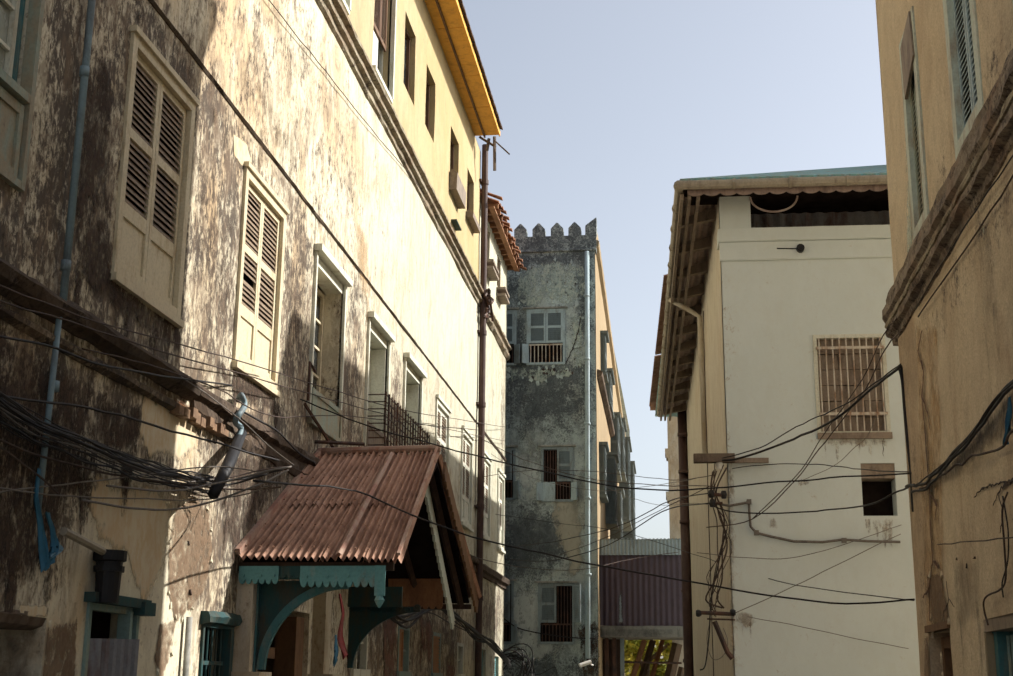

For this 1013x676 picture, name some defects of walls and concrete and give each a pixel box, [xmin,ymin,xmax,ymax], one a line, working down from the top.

water stain [74,60,182,362]
spalling [19,605,77,676]
water stain [0,329,142,613]
peeling [90,473,213,676]
crack [974,477,1013,533]